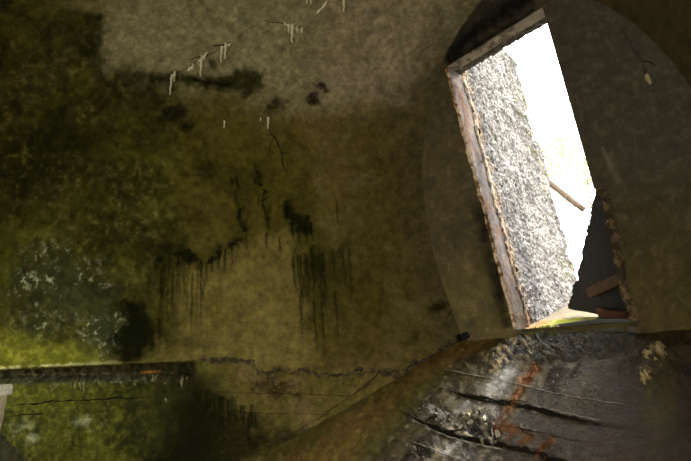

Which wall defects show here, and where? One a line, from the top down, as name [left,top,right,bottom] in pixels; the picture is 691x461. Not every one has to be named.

water stain [148,43,263,98]
water stain [306,83,328,105]
water stain [155,179,247,299]
water stain [284,201,313,241]
spalling [445,68,667,385]
water stain [109,300,161,362]
crack [10,397,148,417]
crack [397,368,630,461]